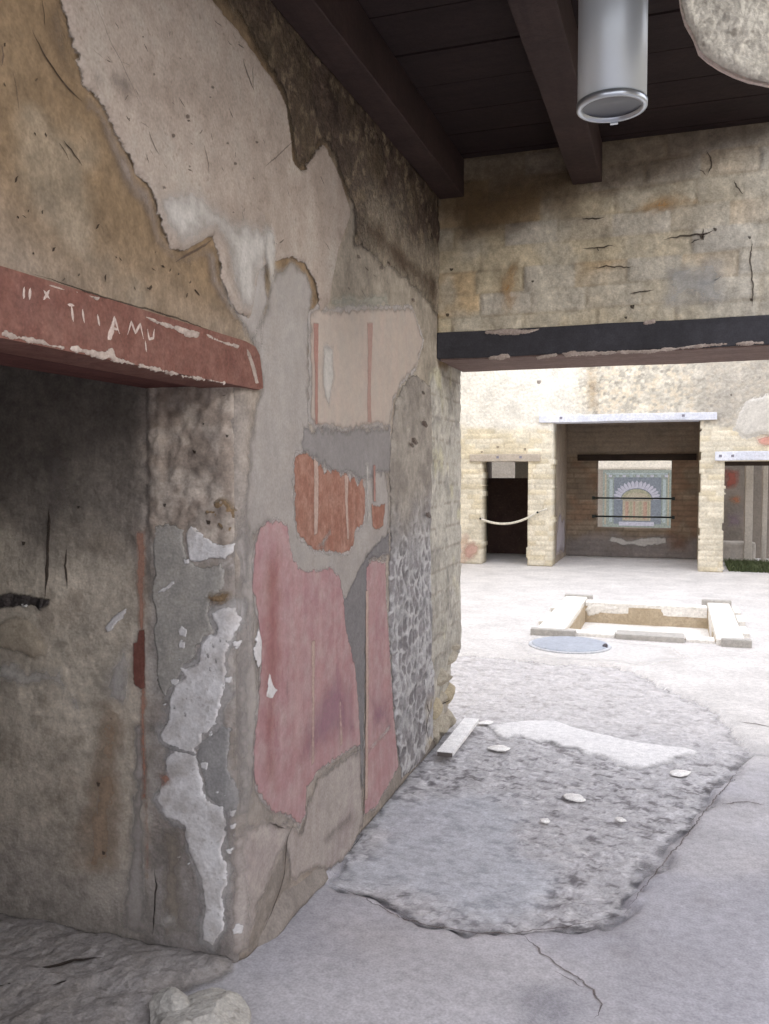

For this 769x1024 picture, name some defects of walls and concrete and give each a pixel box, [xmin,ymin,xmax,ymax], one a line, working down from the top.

peeling [61,0,453,383]
crack [664,229,714,244]
crack [747,246,755,305]
peeling [2,330,226,385]
peeling [536,341,764,360]
crack [45,504,68,594]
peeling [184,499,236,564]
peeling [153,593,363,953]
crack [338,761,768,1016]